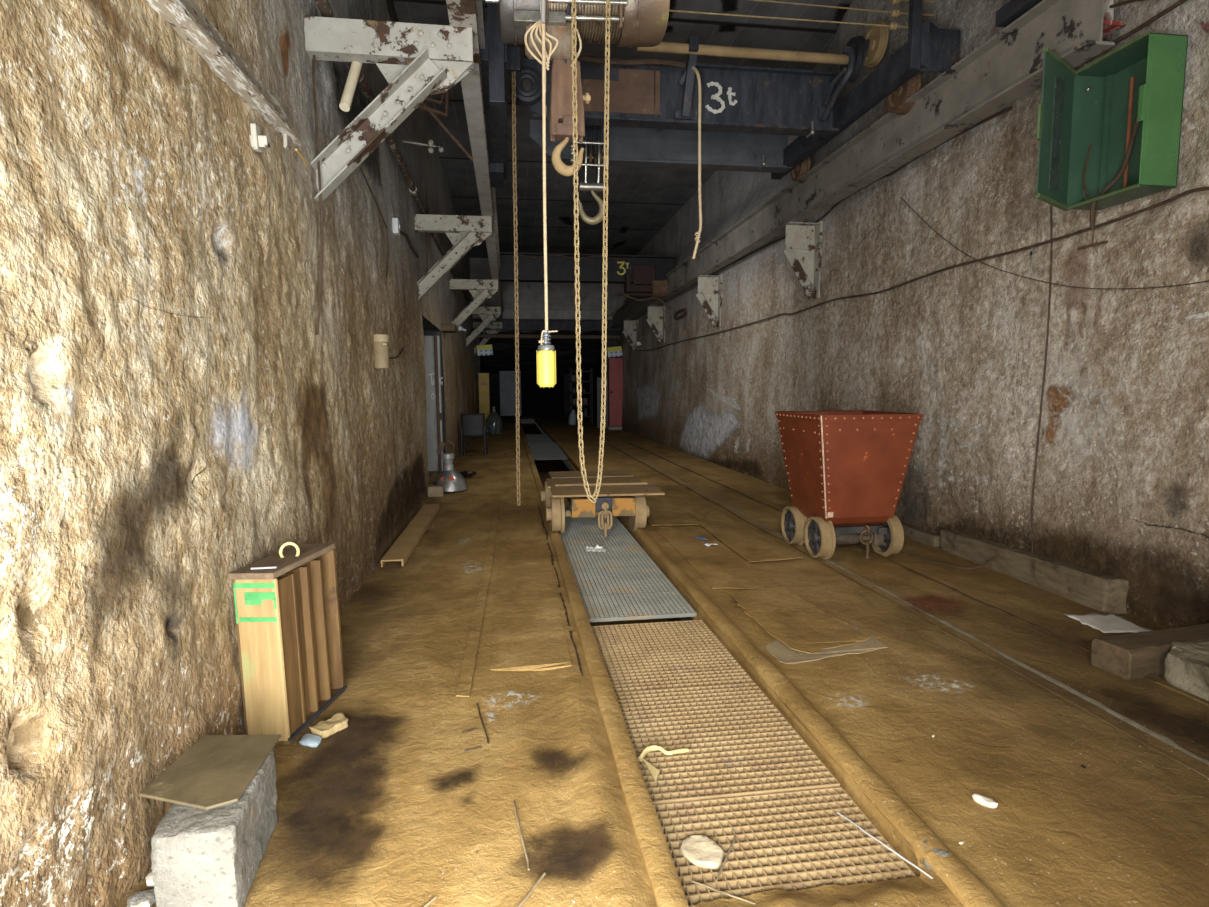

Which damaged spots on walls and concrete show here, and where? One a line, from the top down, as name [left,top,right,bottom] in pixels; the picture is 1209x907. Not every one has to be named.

damp [98,458,187,608]
damp [298,387,335,533]
damp [378,456,426,545]
rust [1046,386,1073,442]
crack [614,439,1209,778]
damp [523,825,613,881]